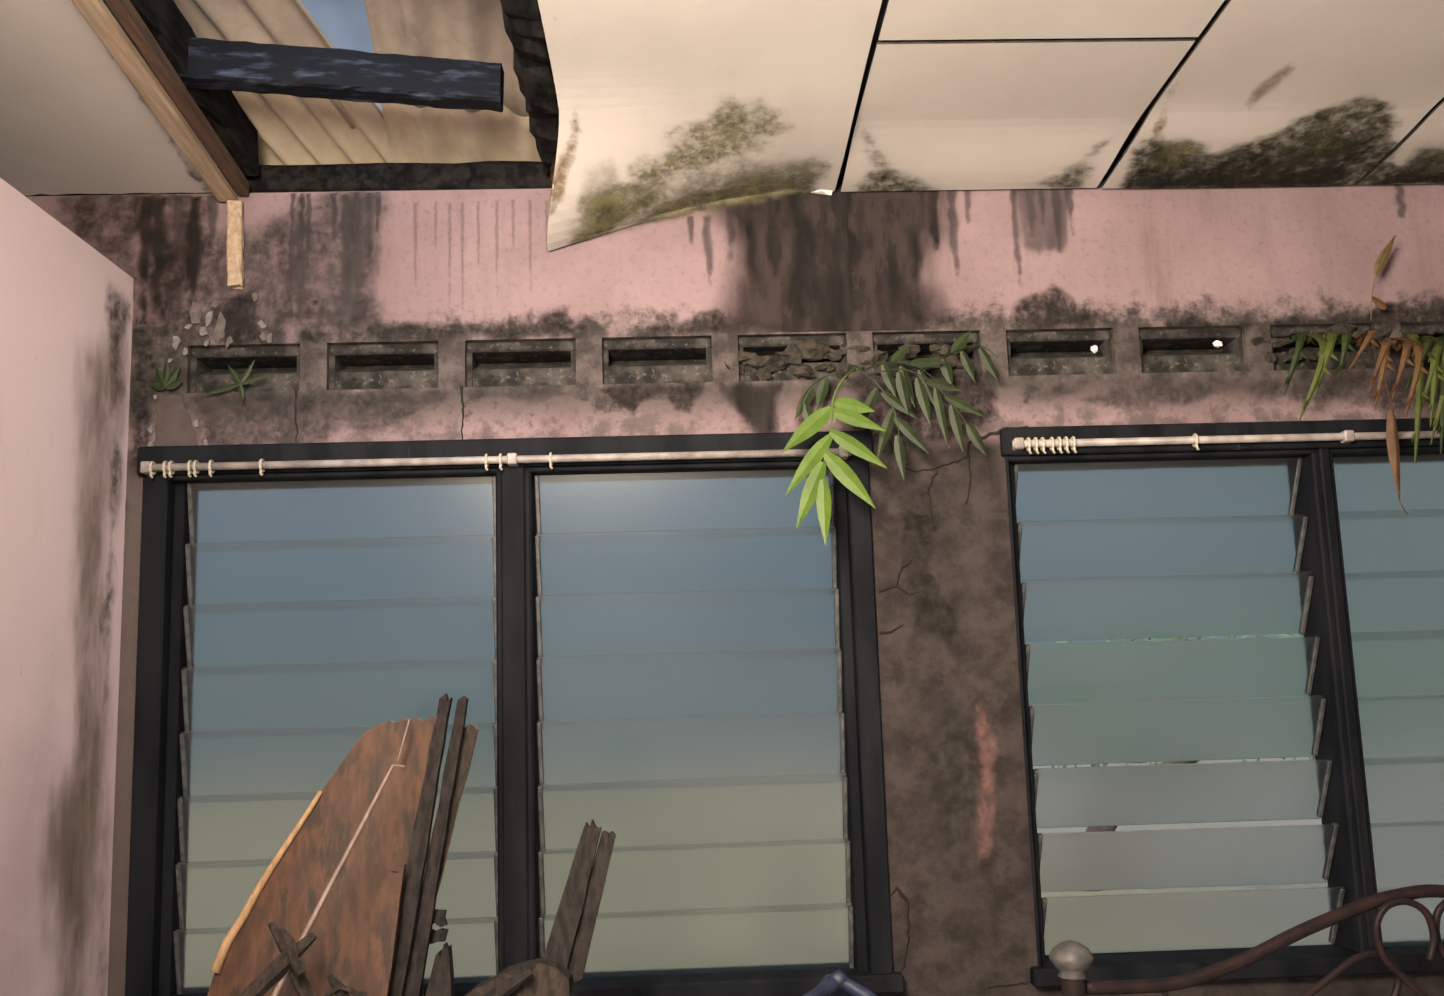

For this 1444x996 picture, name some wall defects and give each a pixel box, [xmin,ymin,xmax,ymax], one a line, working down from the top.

damp [551,120,577,212]
damp [1124,99,1444,189]
damp [645,170,969,338]
damp [1011,169,1084,261]
damp [1015,287,1106,330]
damp [1275,304,1444,328]
damp [72,173,583,617]
mould [606,381,702,411]
damp [728,384,776,433]
damp [829,371,996,452]
damp [1250,381,1441,409]
damp [50,673,100,964]